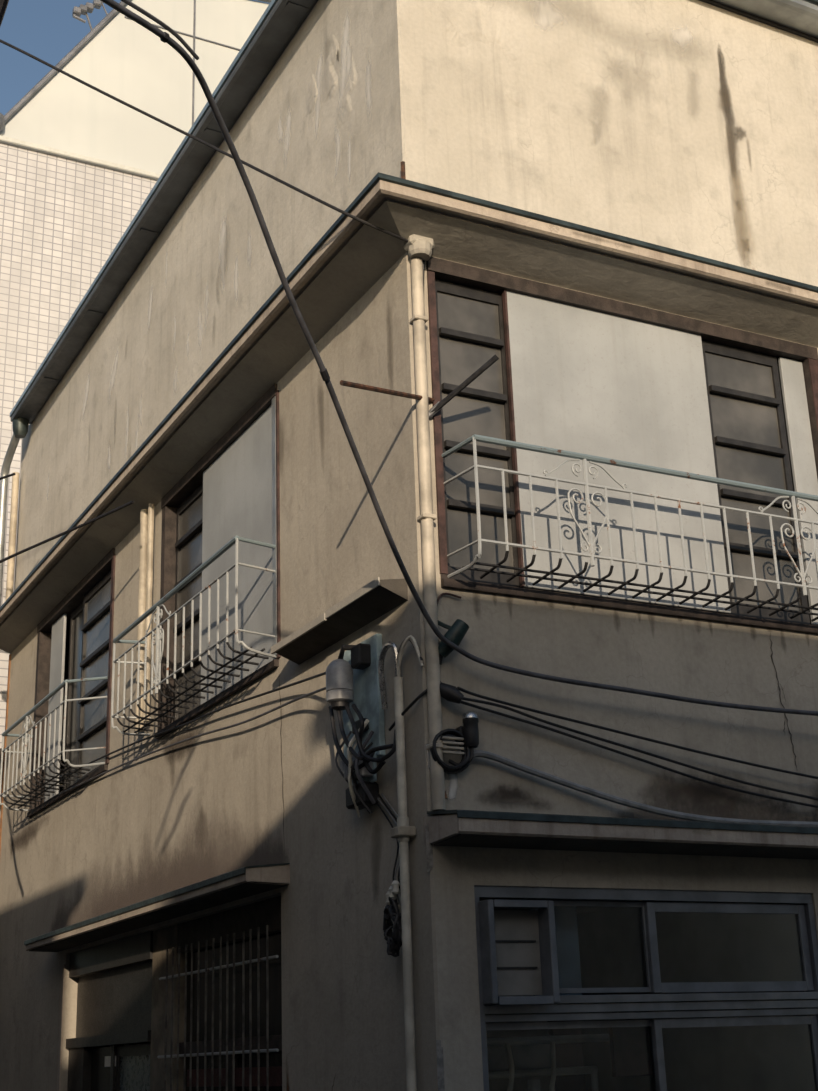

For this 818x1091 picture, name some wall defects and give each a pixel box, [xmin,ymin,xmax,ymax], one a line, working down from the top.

water stain [718,50,745,175]
water stain [165,733,194,757]
crack [770,639,797,768]
water stain [488,787,539,804]
water stain [11,826,37,853]
water stain [52,845,284,931]